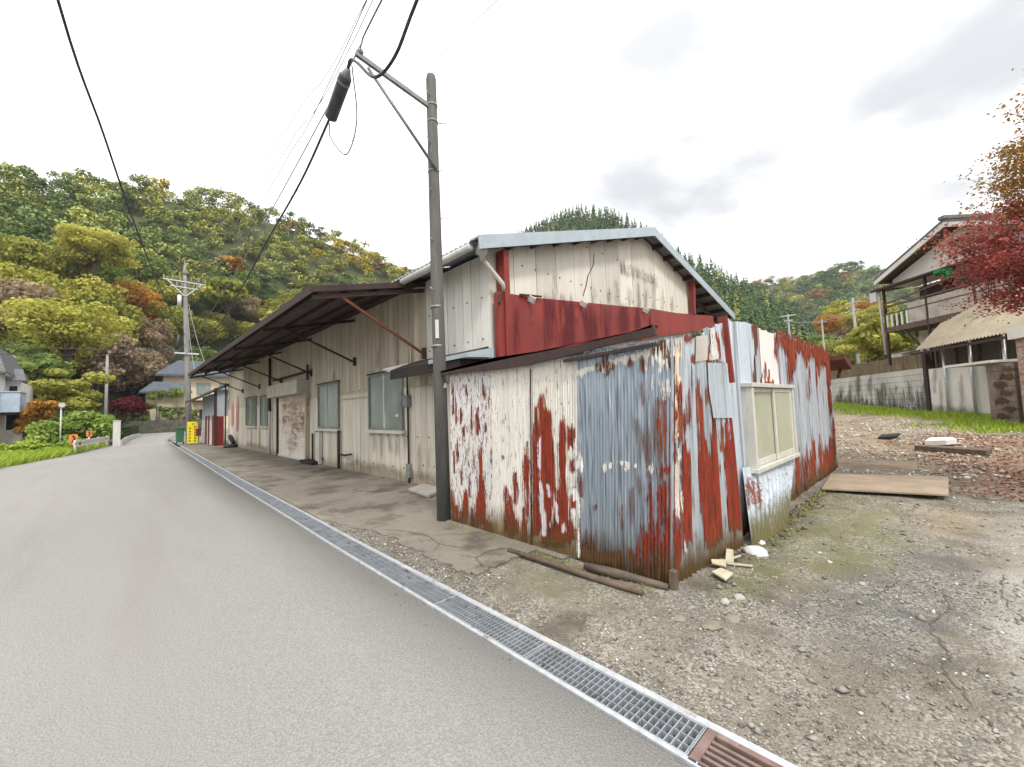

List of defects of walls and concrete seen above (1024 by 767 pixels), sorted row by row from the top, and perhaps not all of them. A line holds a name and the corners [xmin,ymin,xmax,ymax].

corrosion [451,327,763,583]
corrosion [751,324,836,497]
crack [382,529,501,566]